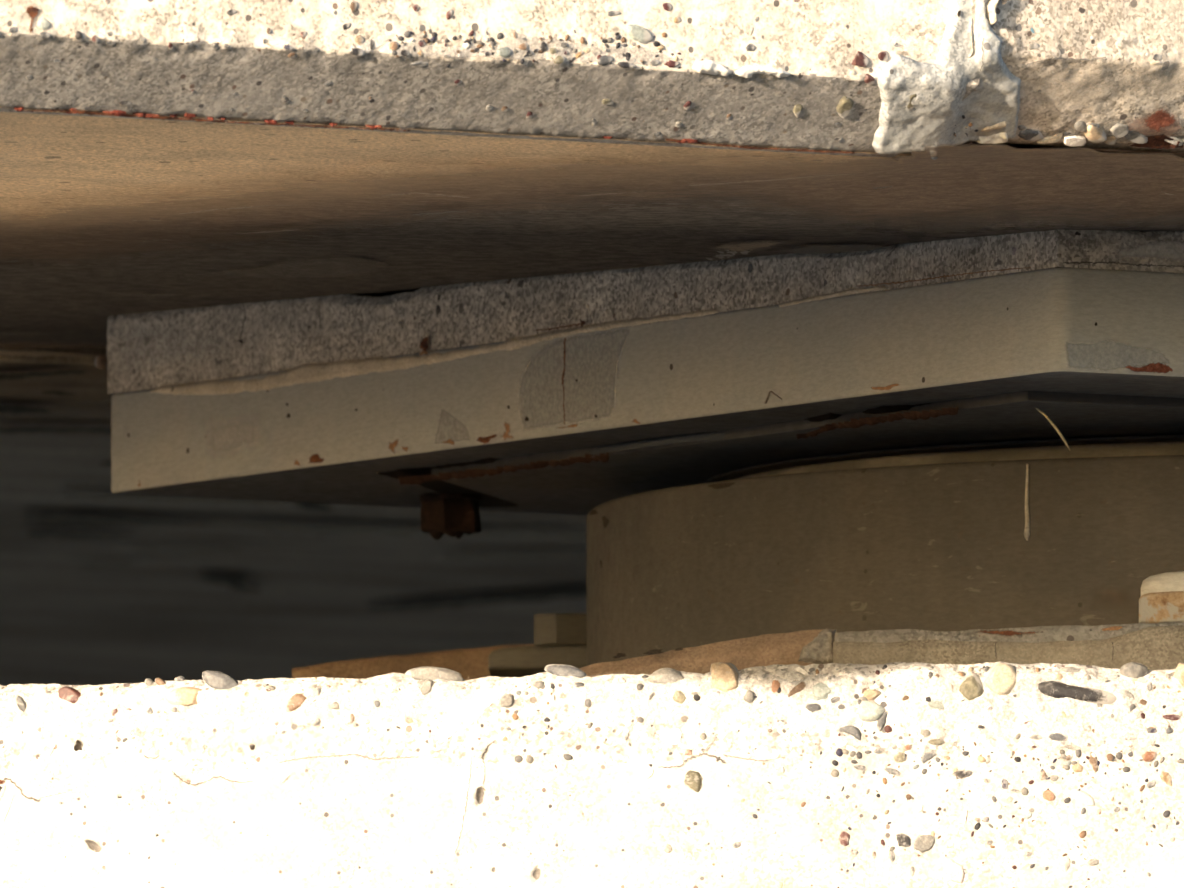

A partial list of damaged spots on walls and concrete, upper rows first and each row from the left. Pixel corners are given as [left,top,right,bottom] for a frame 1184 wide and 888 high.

corrosion [1126,363,1173,373]
crack [144,755,250,785]
crack [279,754,419,783]
crack [0,778,71,802]